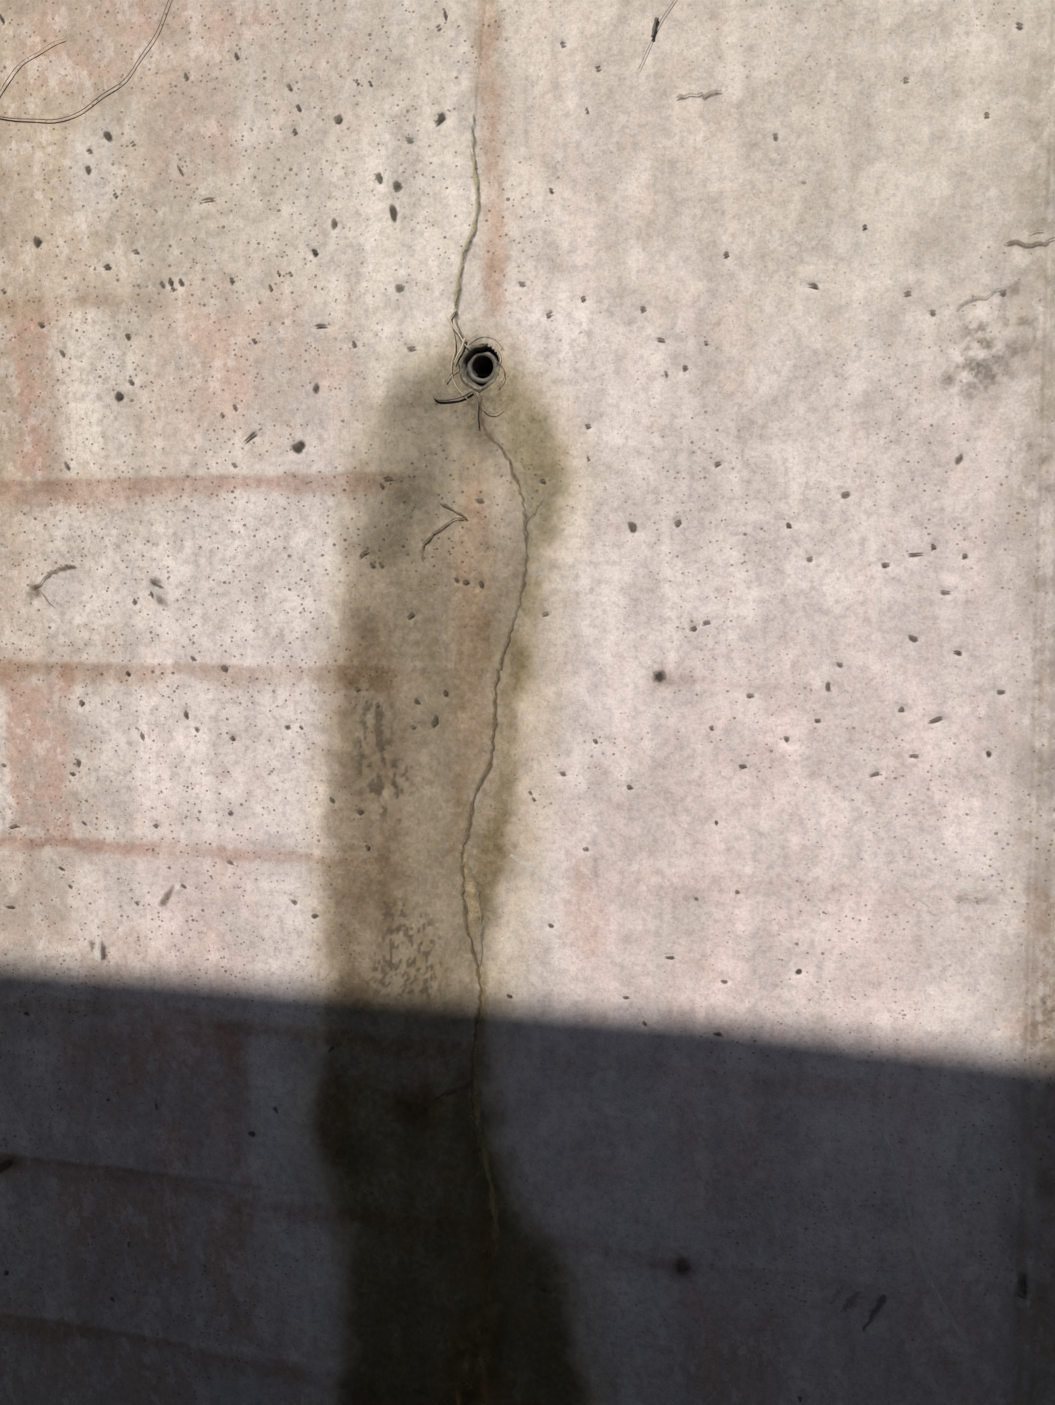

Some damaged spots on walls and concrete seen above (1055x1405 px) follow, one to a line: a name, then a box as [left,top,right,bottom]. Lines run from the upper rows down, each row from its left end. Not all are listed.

crack [454,114,480,339]
crack [419,502,467,562]
crack [434,393,543,1294]